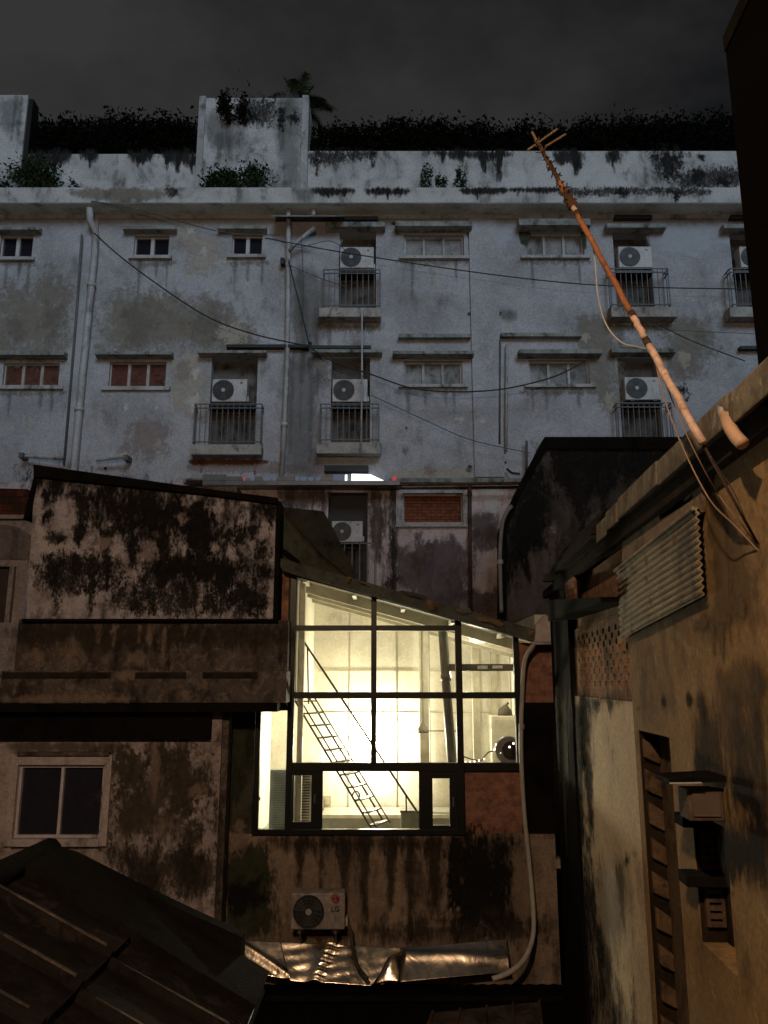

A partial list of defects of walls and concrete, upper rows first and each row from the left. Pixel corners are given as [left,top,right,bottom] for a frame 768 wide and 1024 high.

damp [28,147,99,173]
damp [128,148,196,173]
damp [308,147,410,199]
mould [427,144,739,202]
damp [7,458,325,668]
damp [367,441,668,622]
damp [10,712,551,947]
damp [552,684,635,1024]